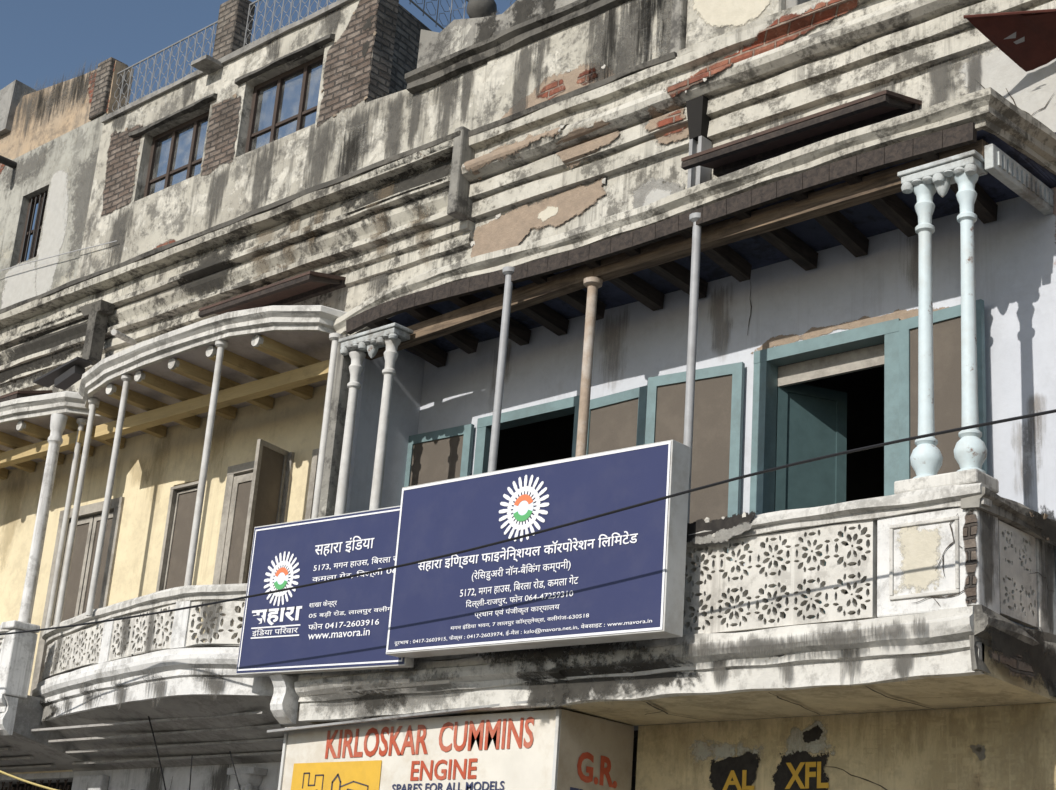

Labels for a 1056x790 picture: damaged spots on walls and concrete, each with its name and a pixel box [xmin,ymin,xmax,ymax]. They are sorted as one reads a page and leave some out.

leakage [585,0,672,85]
flaking render [645,0,858,146]
crack [980,84,1053,116]
leakage [303,70,474,228]
spalling [462,120,620,180]
spalling [470,177,606,258]
leakage [176,239,236,304]
leakage [0,304,88,393]
spalling [751,309,918,354]
spalling [1026,506,1056,545]
leakage [480,618,925,709]
crack [816,764,887,790]